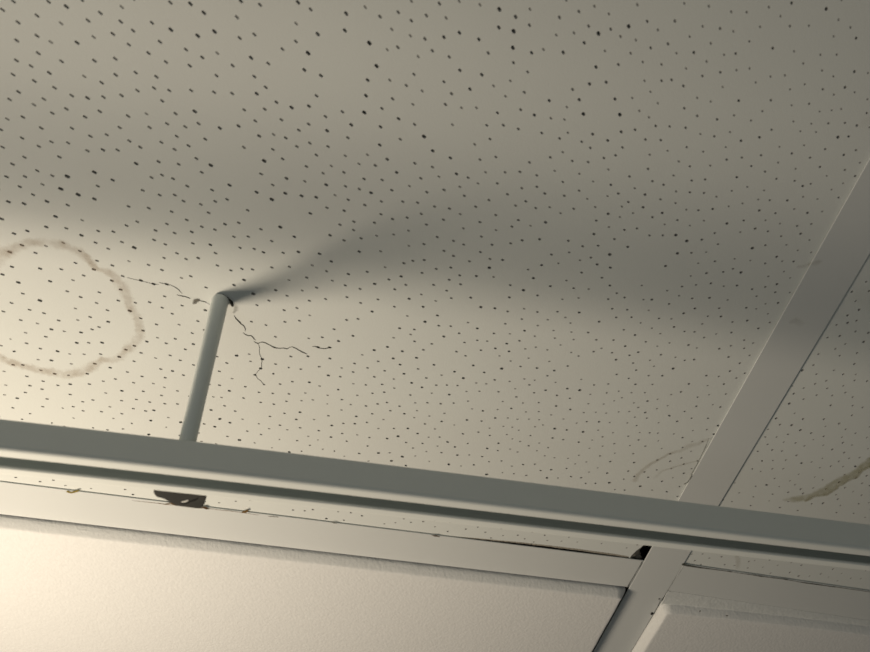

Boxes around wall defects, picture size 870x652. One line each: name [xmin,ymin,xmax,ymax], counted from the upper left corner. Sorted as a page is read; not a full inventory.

crack [130,278,207,304]
crack [234,316,331,381]